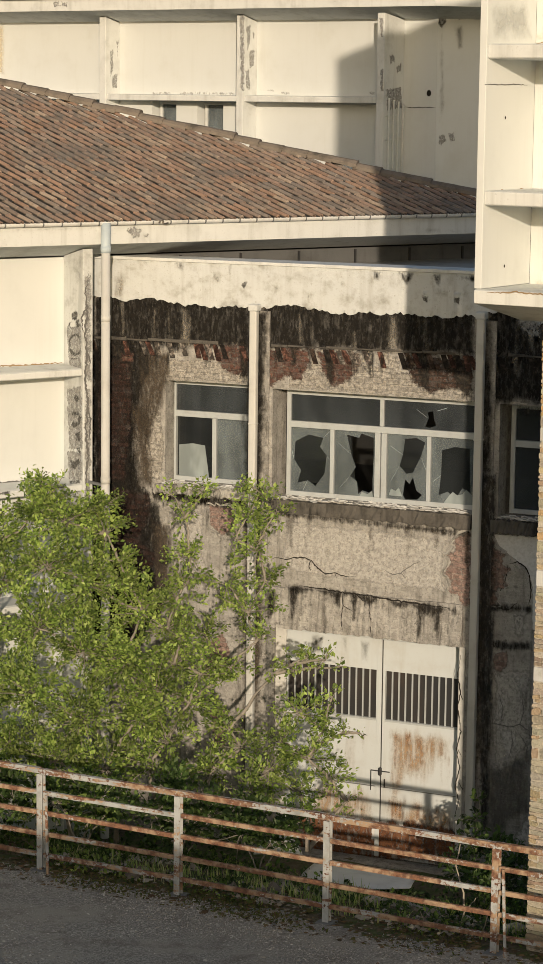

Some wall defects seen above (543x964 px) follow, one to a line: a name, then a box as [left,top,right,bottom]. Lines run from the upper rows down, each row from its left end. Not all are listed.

peeling [380,56,402,110]
peeling [151,345,248,384]
peeling [270,348,473,402]
spalling [67,275,164,569]
leakage [92,297,474,646]
crack [276,557,450,633]
peeling [283,525,472,609]
leakage [283,312,543,855]
crack [500,561,532,610]
leakage [242,520,275,782]
corrosion [398,736,442,770]